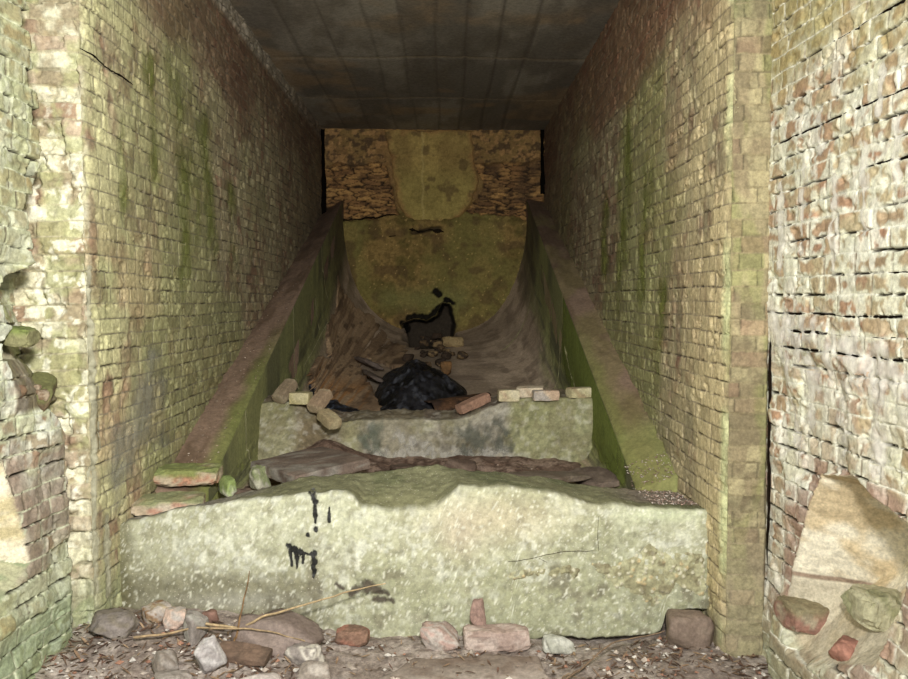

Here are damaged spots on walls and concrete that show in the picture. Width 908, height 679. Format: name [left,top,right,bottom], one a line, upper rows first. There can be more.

crack [80,48,133,85]
flaking render [325,129,544,222]
spalling [0,267,30,326]
spalling [1,339,41,416]
crack [766,311,908,564]